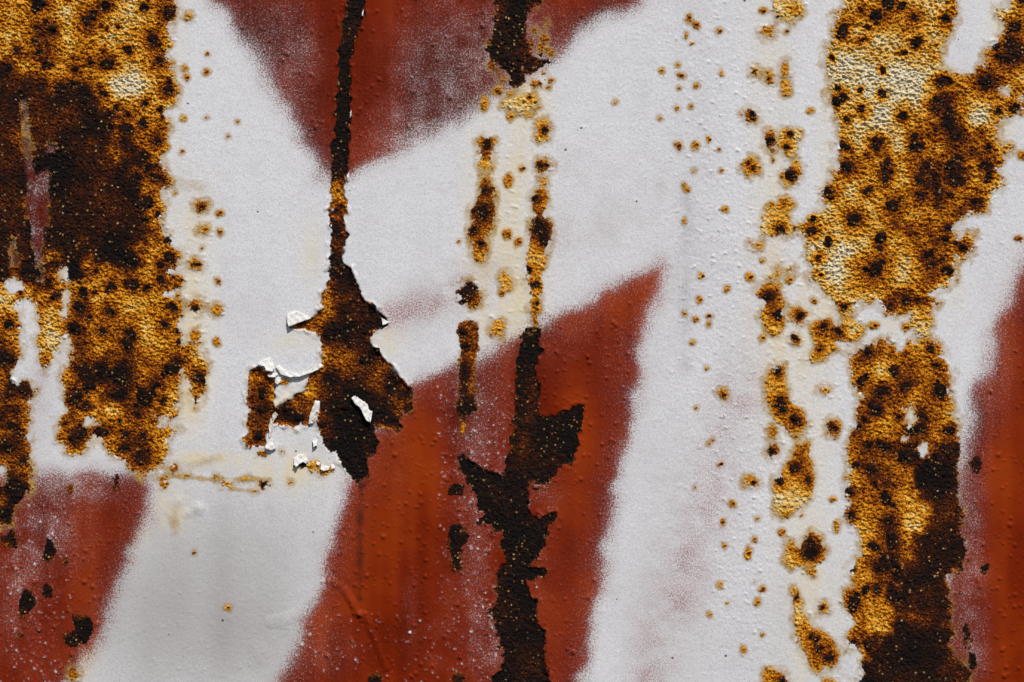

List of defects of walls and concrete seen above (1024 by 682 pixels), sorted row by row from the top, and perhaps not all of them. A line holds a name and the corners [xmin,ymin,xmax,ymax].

corrosion [684,13,701,45]
corrosion [658,62,699,90]
corrosion [673,136,721,151]
corrosion [0,0,225,548]
corrosion [447,0,585,682]
corrosion [739,0,1024,682]
peeling [242,266,413,483]
corrosion [42,538,68,565]
corrosion [19,583,53,618]
corrosion [61,614,95,647]